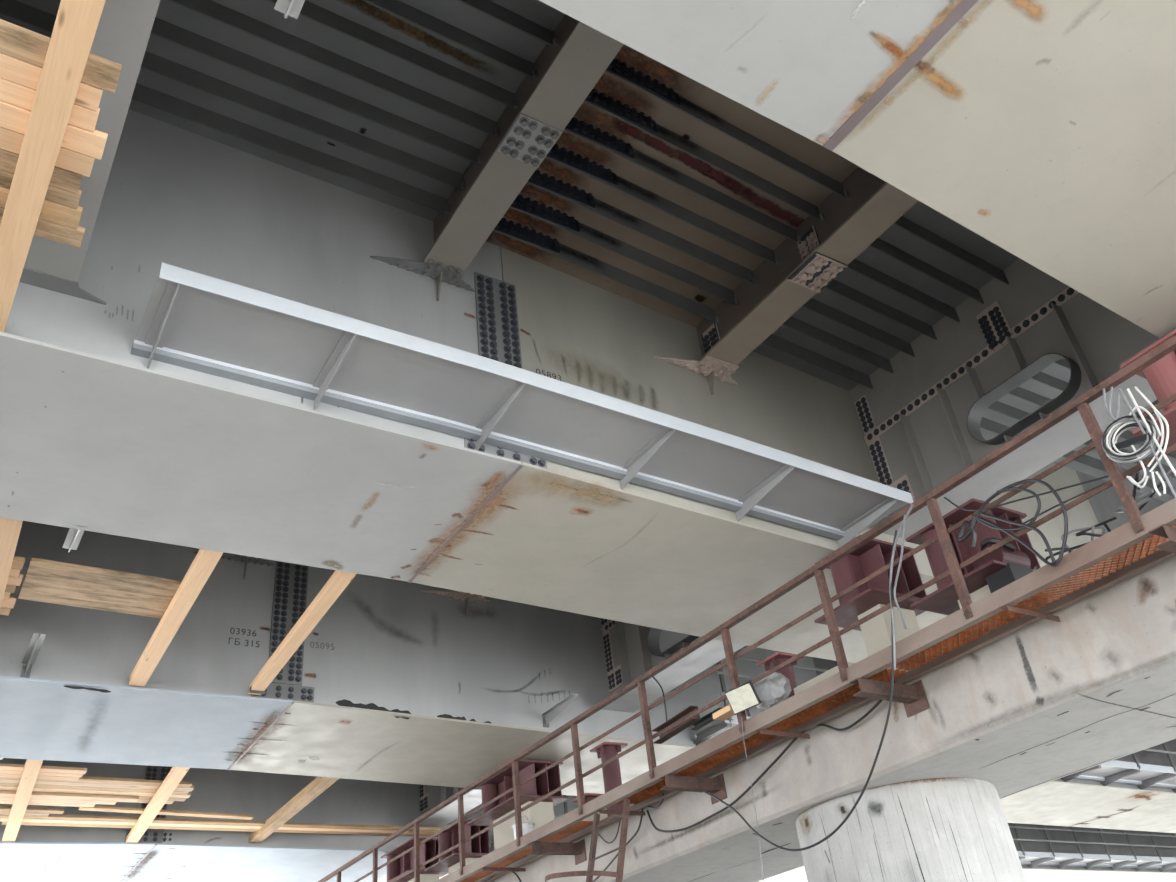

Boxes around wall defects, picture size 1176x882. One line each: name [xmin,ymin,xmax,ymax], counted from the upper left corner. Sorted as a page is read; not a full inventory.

corrosion [594,76,650,108]
corrosion [615,46,720,122]
corrosion [852,0,983,115]
corrosion [486,231,543,257]
corrosion [391,473,516,579]
corrosion [226,713,290,761]